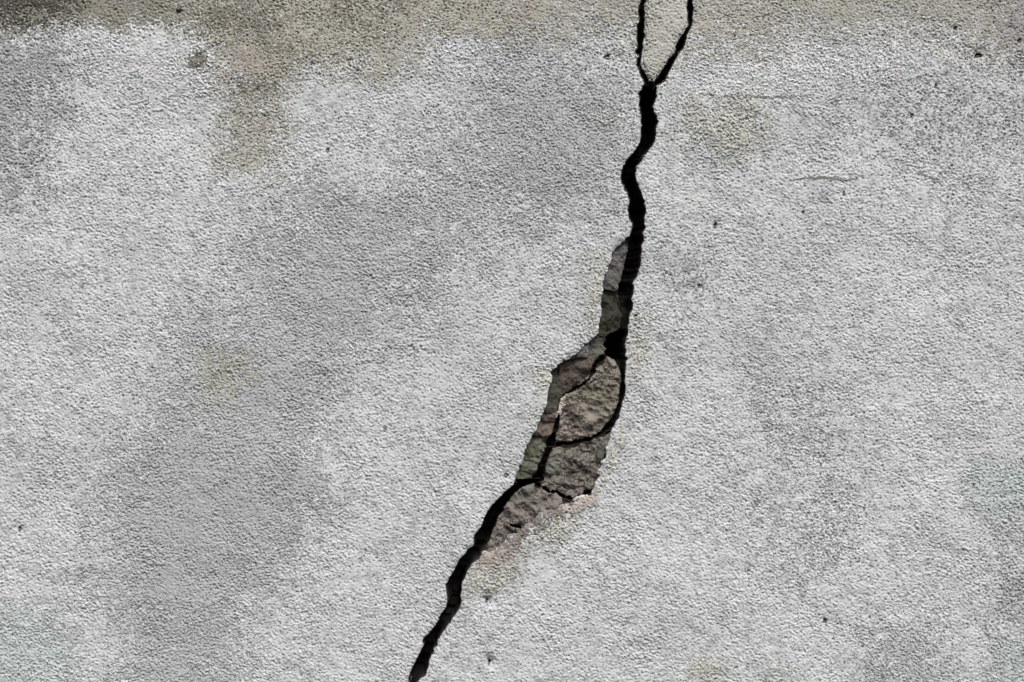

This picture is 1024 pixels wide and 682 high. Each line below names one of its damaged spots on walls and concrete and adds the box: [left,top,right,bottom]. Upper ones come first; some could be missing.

spalling [461,237,637,605]
crack [408,0,694,682]